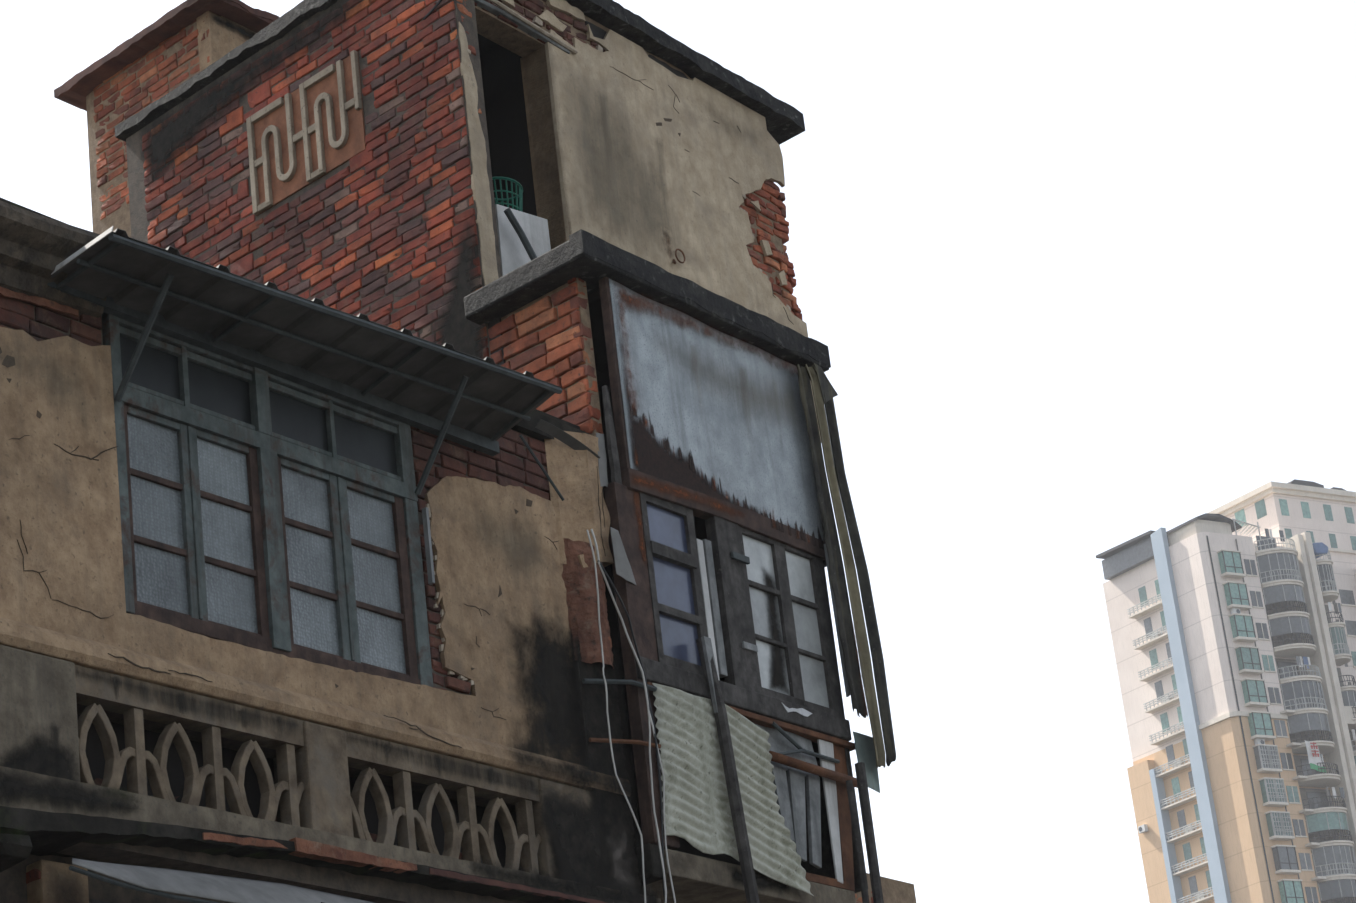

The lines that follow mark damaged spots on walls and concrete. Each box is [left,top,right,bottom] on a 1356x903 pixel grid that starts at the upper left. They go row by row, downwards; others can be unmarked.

flaking render [457,0,605,87]
flaking render [739,180,803,320]
crack [17,520,113,619]
crack [108,653,212,682]
flaking render [562,538,614,669]
water stain [355,618,659,903]